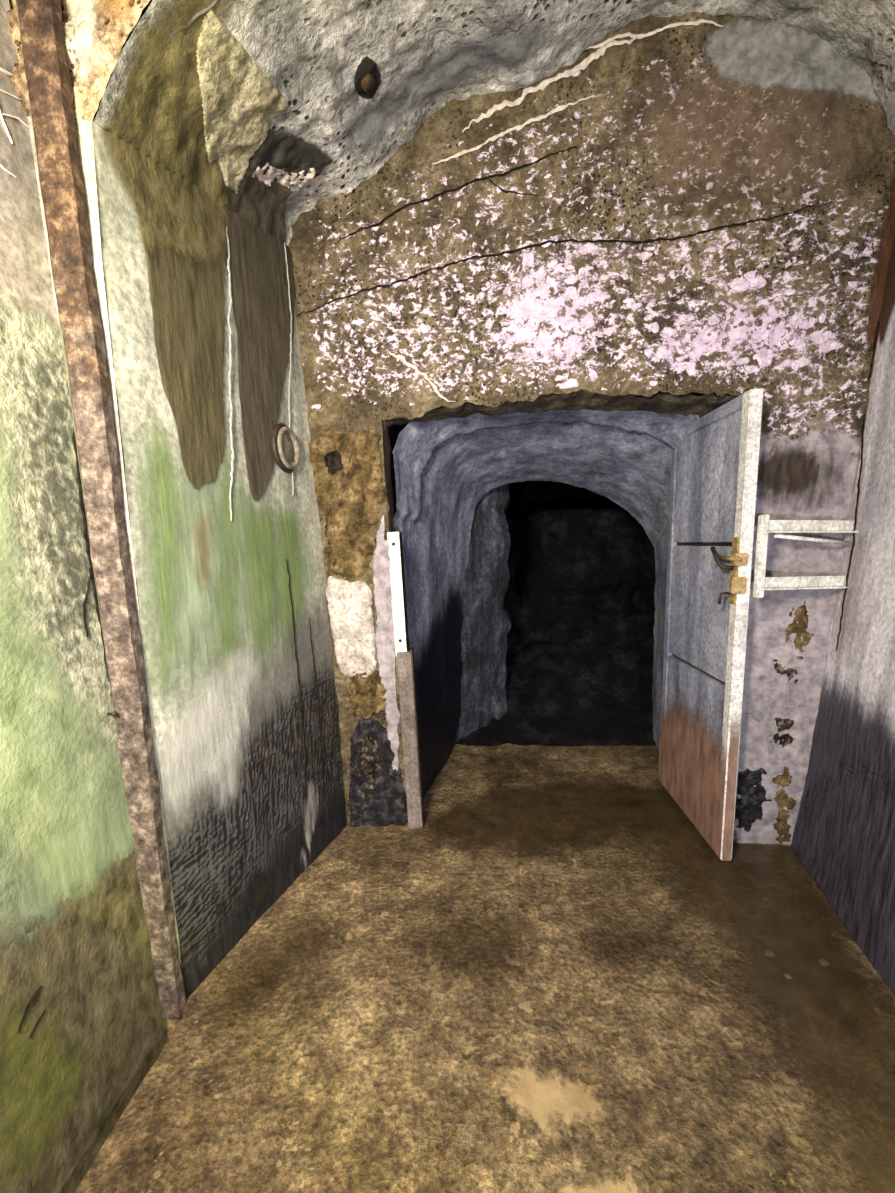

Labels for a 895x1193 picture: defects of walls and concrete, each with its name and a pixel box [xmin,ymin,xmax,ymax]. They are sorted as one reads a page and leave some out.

damp [102,0,347,999]